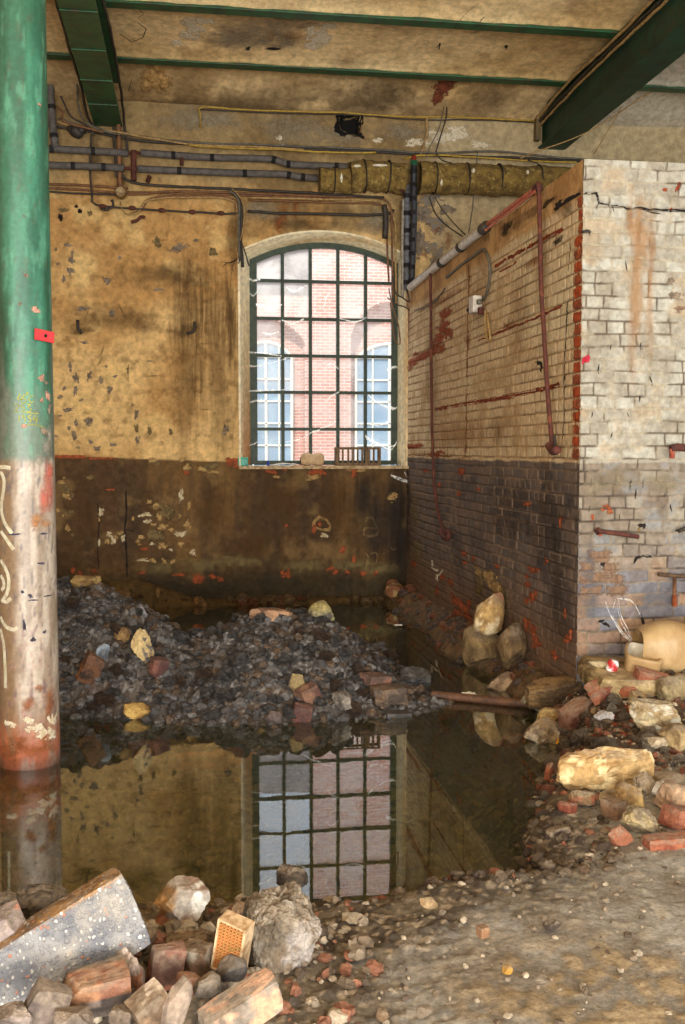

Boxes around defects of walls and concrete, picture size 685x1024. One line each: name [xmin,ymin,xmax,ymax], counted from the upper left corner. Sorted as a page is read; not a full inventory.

spalling [334,113,383,143]
peeling [405,124,492,149]
hole [58,204,92,222]
crack [554,192,685,214]
peeling [54,243,75,284]
peeling [152,237,198,253]
peeling [407,307,453,369]
rust [435,264,563,458]
peeling [130,403,152,445]
peeling [98,489,224,584]